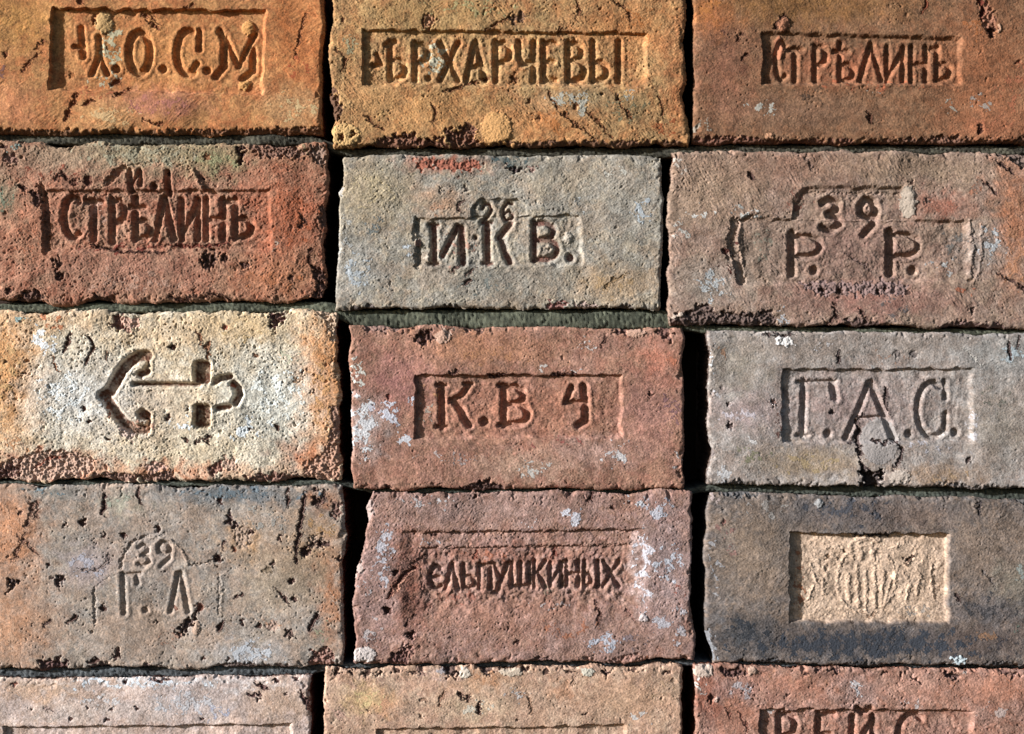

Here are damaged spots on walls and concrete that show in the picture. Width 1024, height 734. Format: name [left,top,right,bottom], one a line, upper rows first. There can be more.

leakage [350,356,433,464]
spalling [858,465,884,487]
leakage [584,494,687,653]